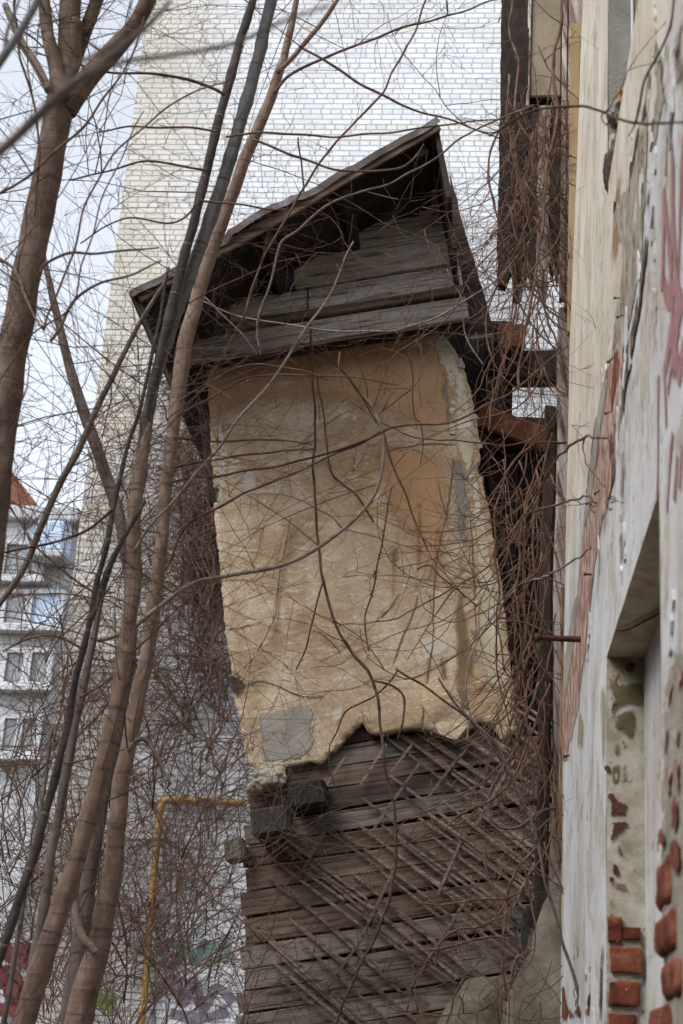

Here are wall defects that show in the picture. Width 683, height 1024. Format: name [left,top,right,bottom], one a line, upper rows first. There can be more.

spalling [562,1,683,761]
flaking render [422,716,467,740]
spalling [562,651,683,1024]